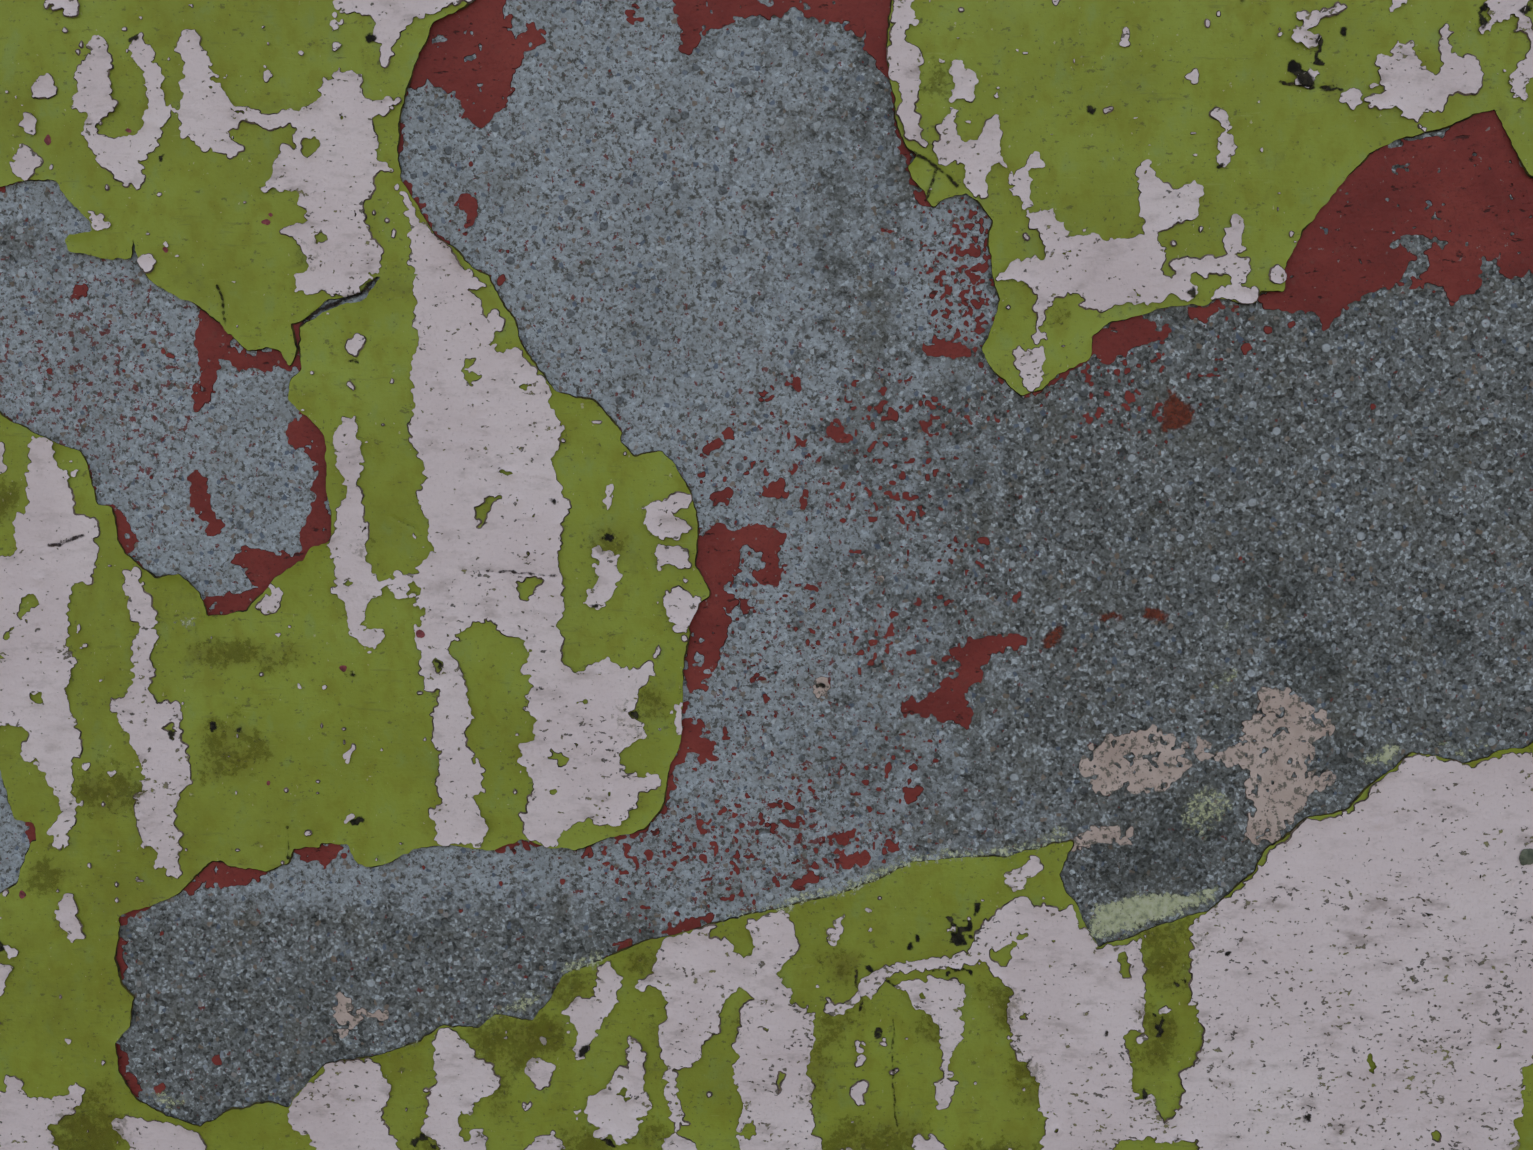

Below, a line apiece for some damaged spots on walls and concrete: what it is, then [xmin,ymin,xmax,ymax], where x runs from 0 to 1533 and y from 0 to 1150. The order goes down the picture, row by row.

peeling [886,0,1533,345]
peeling [0,0,471,615]
peeling [452,246,538,368]
peeling [982,273,1231,396]
peeling [548,384,711,851]
peeling [0,439,450,1150]
peeling [448,620,537,851]
peeling [420,936,756,1150]
peeling [702,908,778,958]
peeling [776,840,1088,1150]
peeling [1105,909,1210,1122]
peeling [1513,1064,1533,1150]